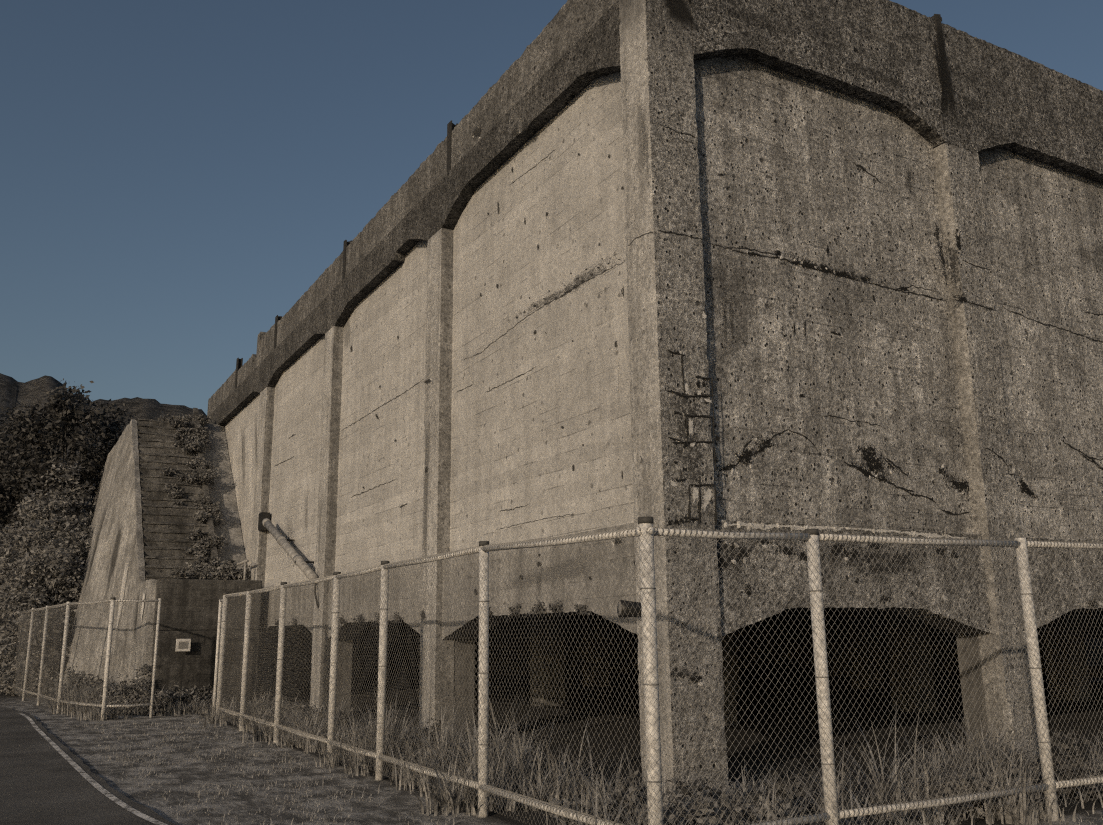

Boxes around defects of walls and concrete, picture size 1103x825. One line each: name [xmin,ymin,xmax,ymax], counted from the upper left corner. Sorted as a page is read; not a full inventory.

crack [456,230,1103,393]
spalling [667,350,773,473]
crack [718,429,818,472]
spalling [852,445,897,483]
crack [845,458,970,515]
spalling [937,464,969,494]
crack [1059,438,1103,470]
spalling [667,476,966,603]